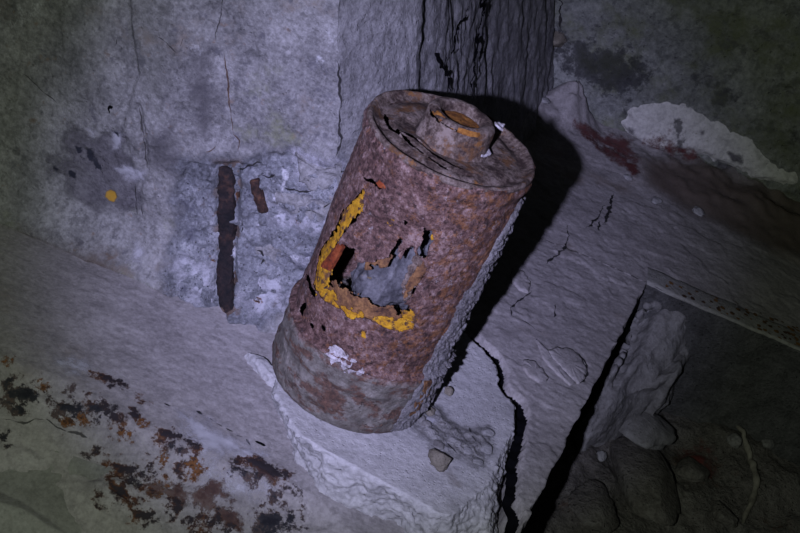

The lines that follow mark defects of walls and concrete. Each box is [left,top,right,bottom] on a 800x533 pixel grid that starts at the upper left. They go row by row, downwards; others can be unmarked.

crack [434,0,486,99]
corrosion [574,120,640,175]
spalling [161,147,346,330]
corrosion [0,355,308,533]
crack [464,331,528,533]